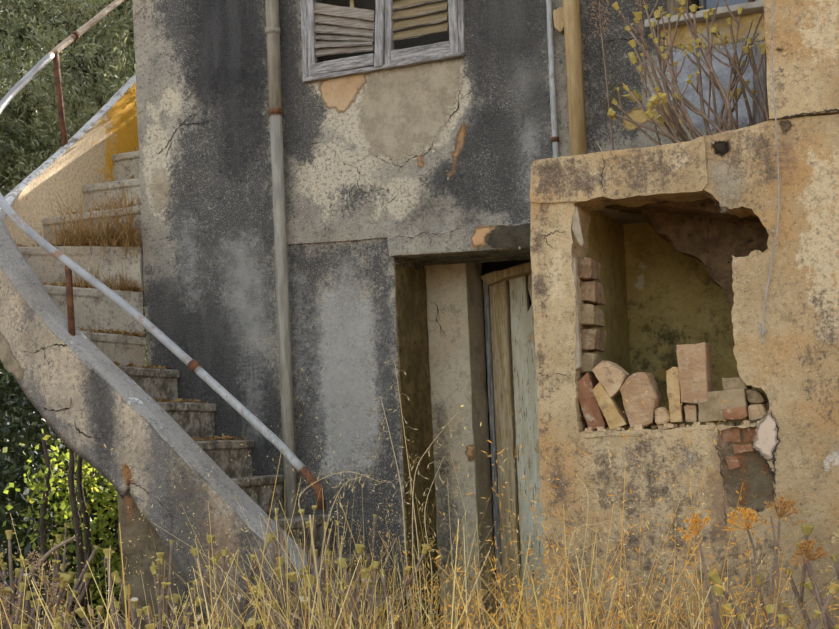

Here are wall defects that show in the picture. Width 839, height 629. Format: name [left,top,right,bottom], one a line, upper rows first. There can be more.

crack [157,110,224,166]
leakage [187,0,267,182]
crack [299,67,473,205]
flaking render [318,58,462,167]
flaking render [446,123,467,180]
spalling [471,223,531,250]
crack [44,400,115,444]
flaking render [718,411,779,512]